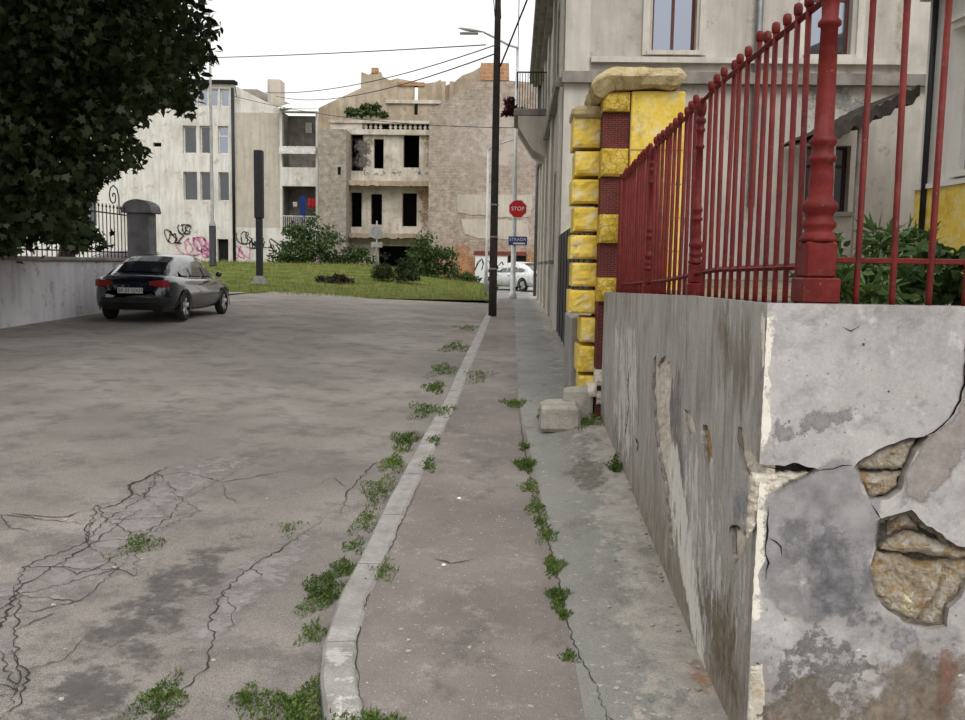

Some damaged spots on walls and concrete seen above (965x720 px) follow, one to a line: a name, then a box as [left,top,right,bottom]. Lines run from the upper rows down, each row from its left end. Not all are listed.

crack [923,350,965,438]
peeling [655,353,678,547]
peeling [682,411,714,484]
crack [763,464,852,472]
spalling [854,389,965,626]
damp [782,521,881,625]
damp [757,623,965,720]